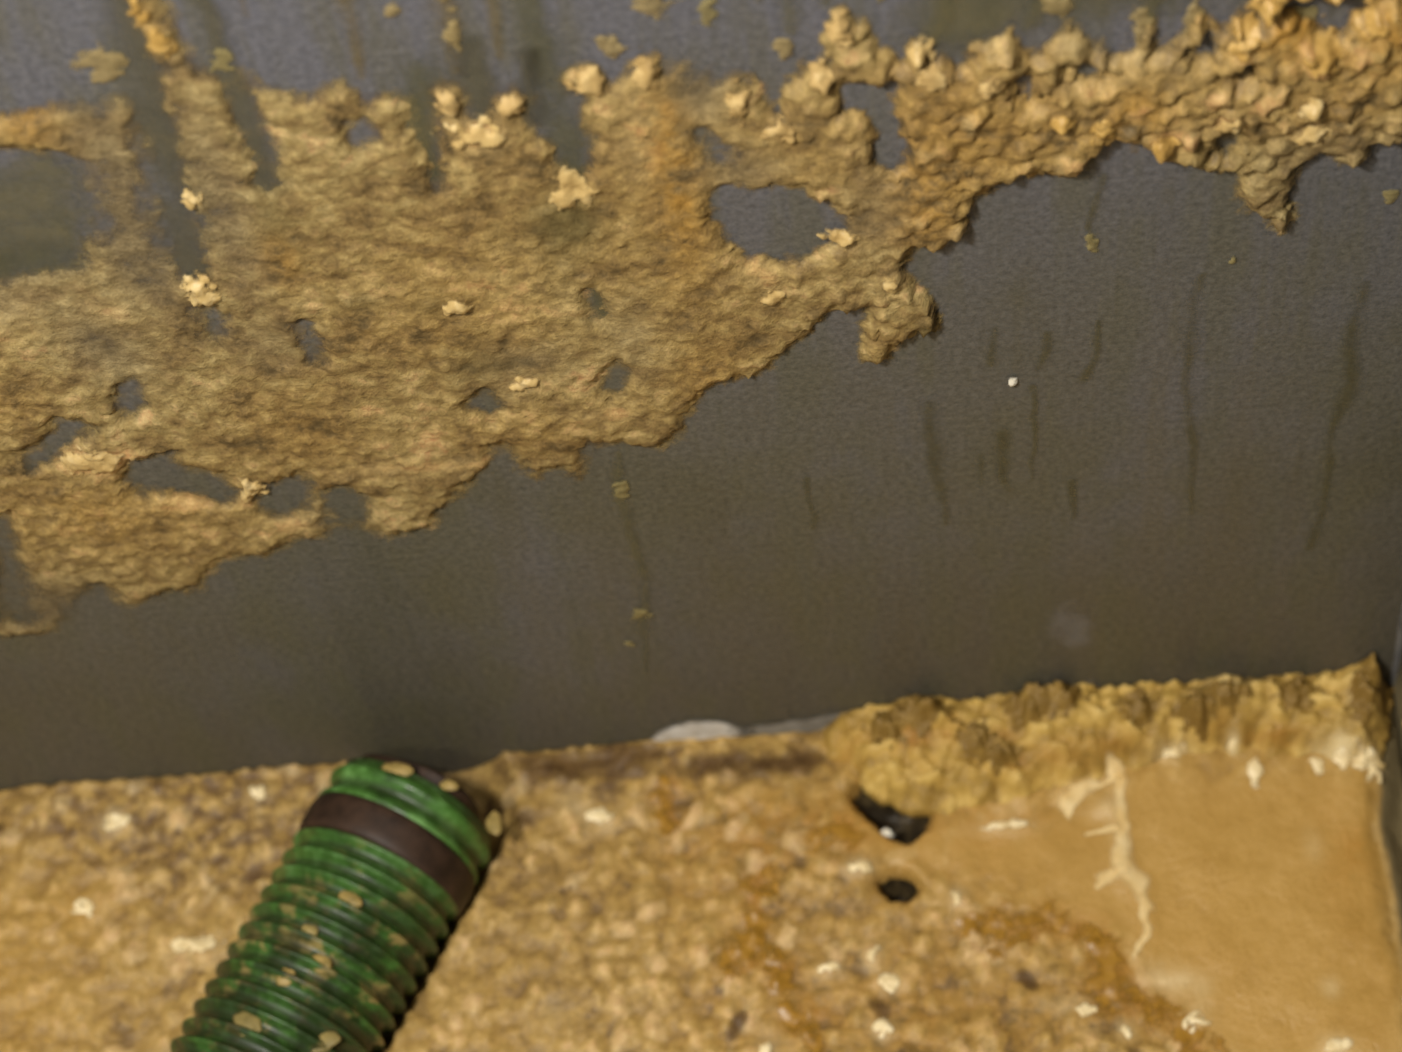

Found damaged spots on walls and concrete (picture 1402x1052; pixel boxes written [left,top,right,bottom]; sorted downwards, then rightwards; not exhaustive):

water stain [114,0,178,182]
water stain [196,0,272,191]
water stain [176,204,206,278]
peeling [0,0,1402,637]
peeling [847,860,873,873]
crack [1059,755,1153,958]